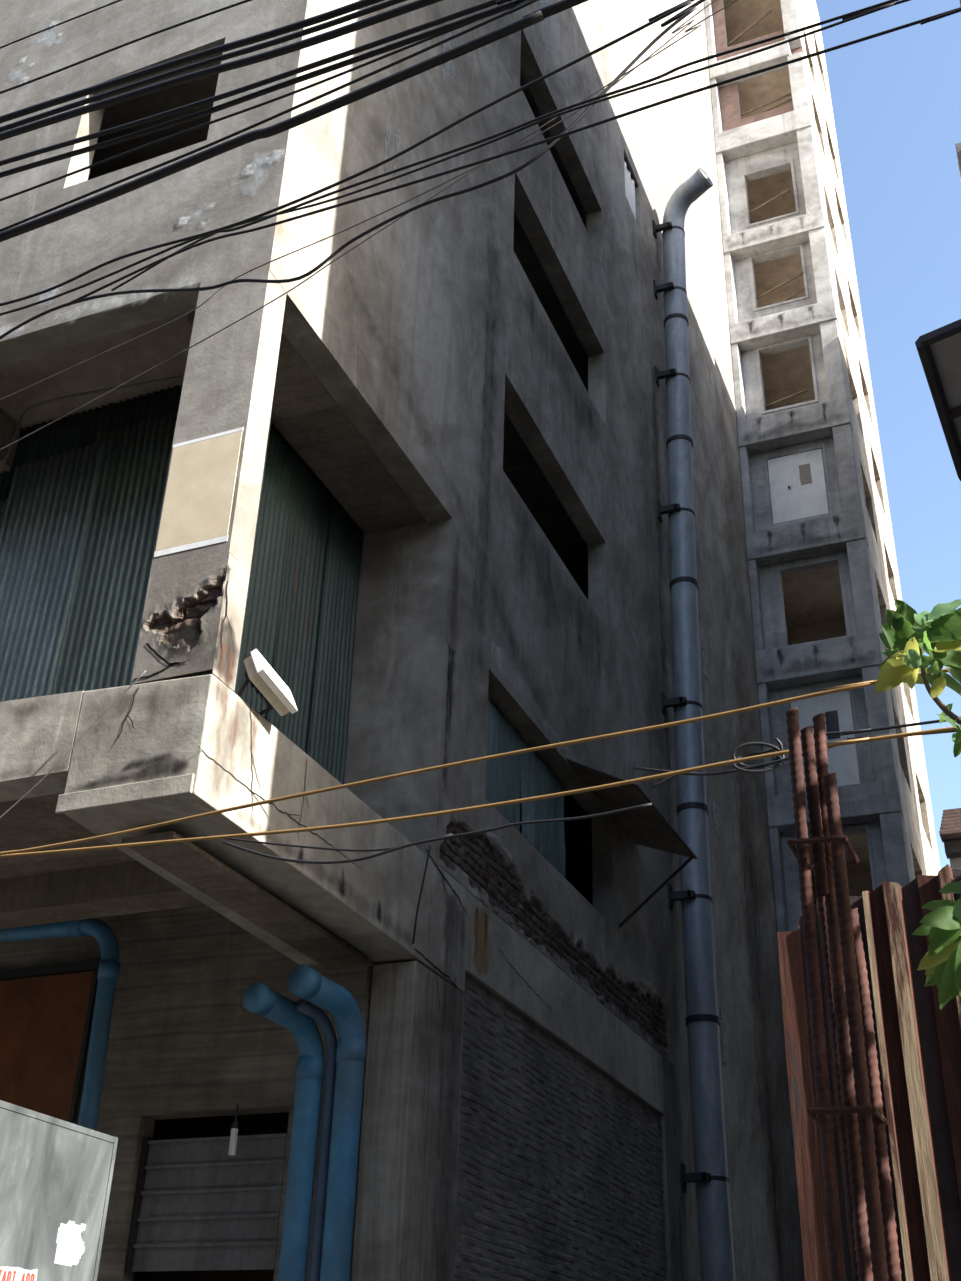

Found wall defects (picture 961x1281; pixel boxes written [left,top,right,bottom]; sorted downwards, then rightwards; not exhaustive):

flaking render [241,151,283,189]
spalling [131,552,230,684]
crack [109,687,139,751]
water stain [85,753,187,787]
crack [198,699,368,875]
spalling [436,769,675,1065]